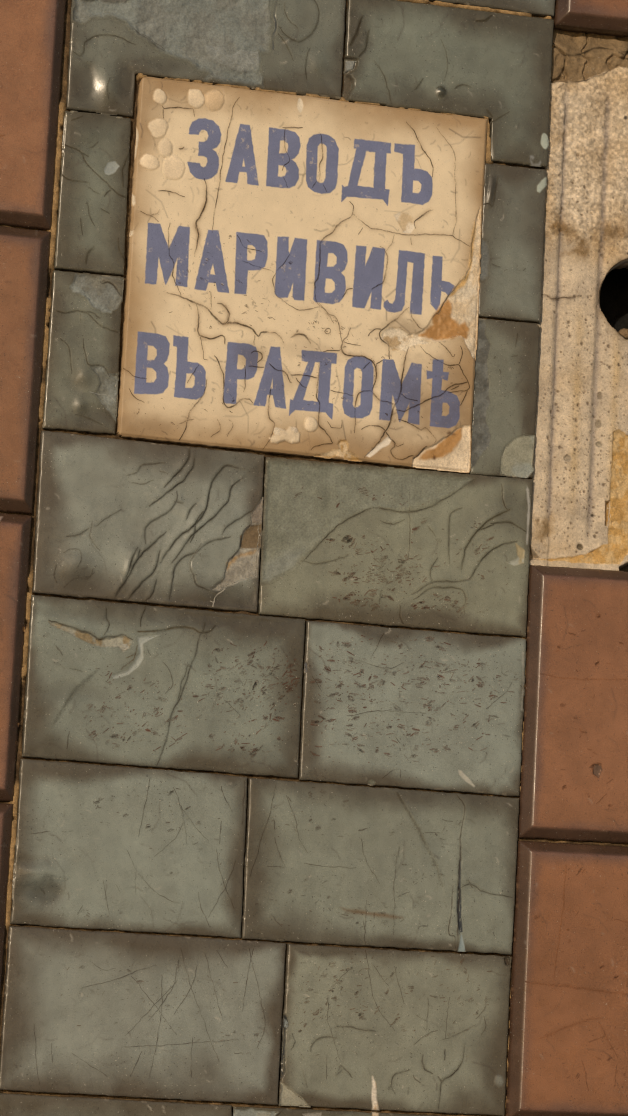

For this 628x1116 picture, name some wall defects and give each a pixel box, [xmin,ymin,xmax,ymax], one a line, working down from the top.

spalling [71,0,274,89]
peeling [207,29,628,592]
crack [48,16,527,766]
spalling [48,621,163,680]
crack [396,792,512,951]
peeling [256,1081,322,1116]